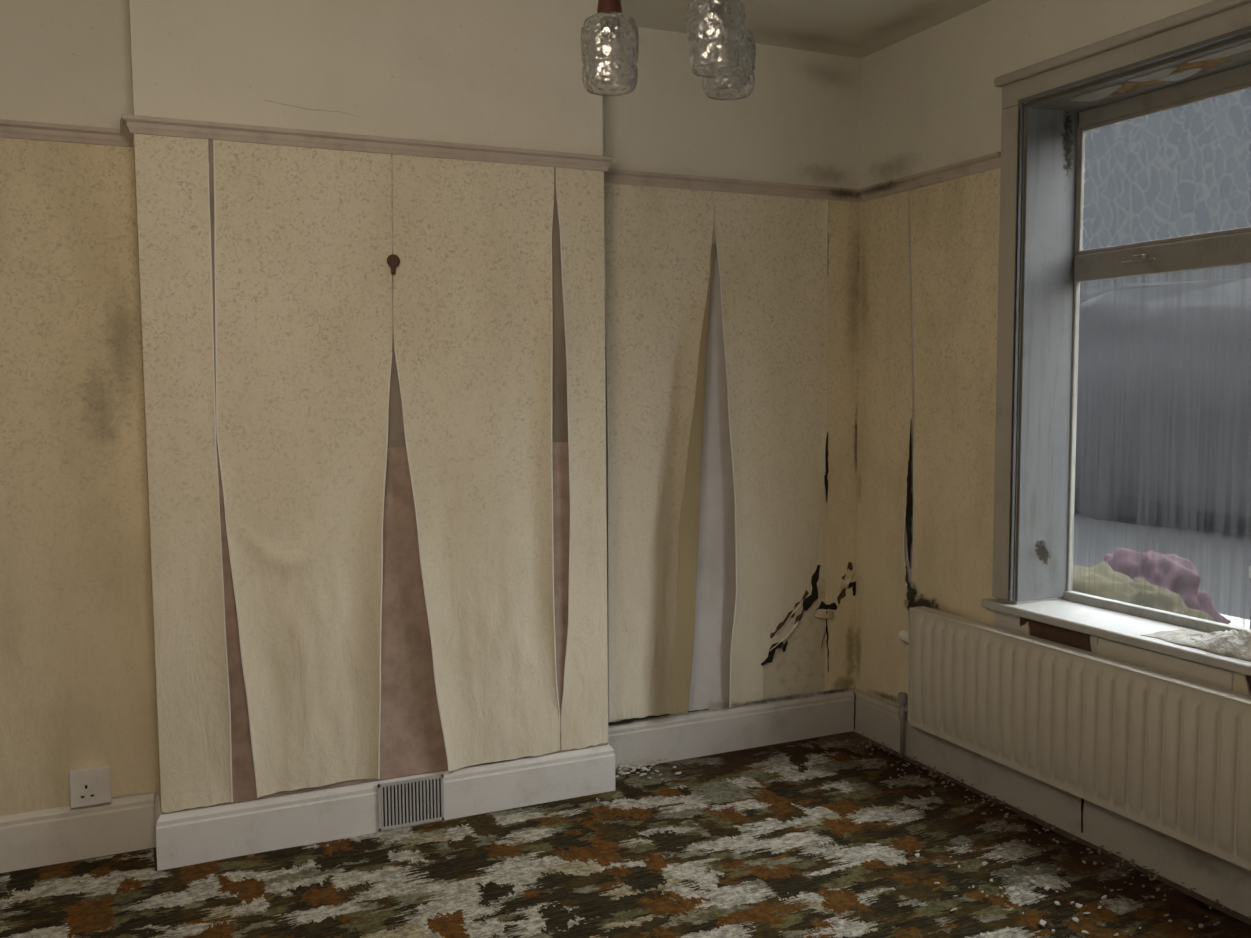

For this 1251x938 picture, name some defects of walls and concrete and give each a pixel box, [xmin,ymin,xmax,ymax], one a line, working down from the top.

crack [821,611,829,672]